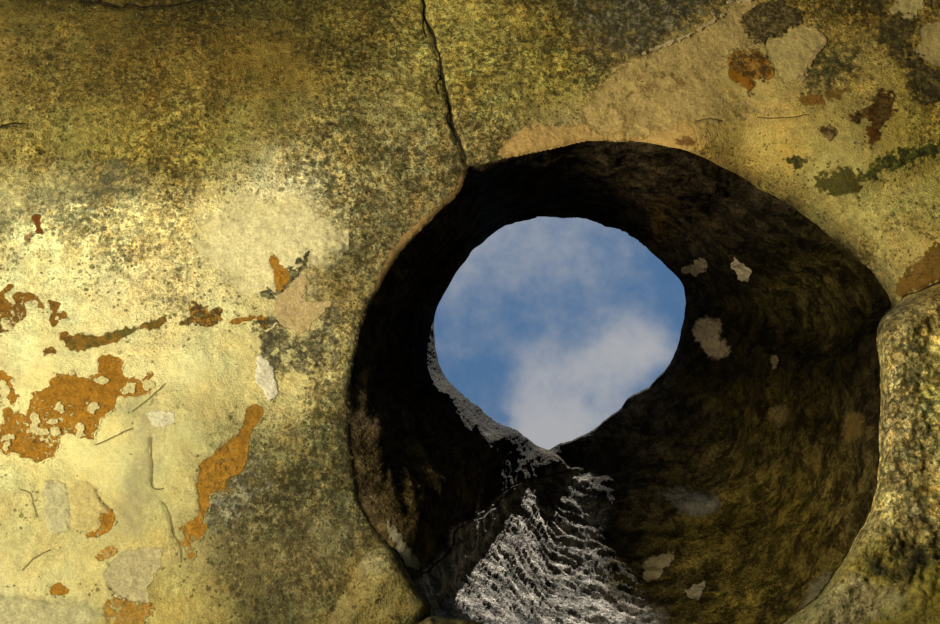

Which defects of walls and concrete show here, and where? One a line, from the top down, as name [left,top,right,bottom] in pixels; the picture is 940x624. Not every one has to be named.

crack [84,0,199,9]
crack [422,0,466,162]
corrosion [727,48,775,93]
corrosion [842,88,898,145]
flaking render [0,583,155,624]